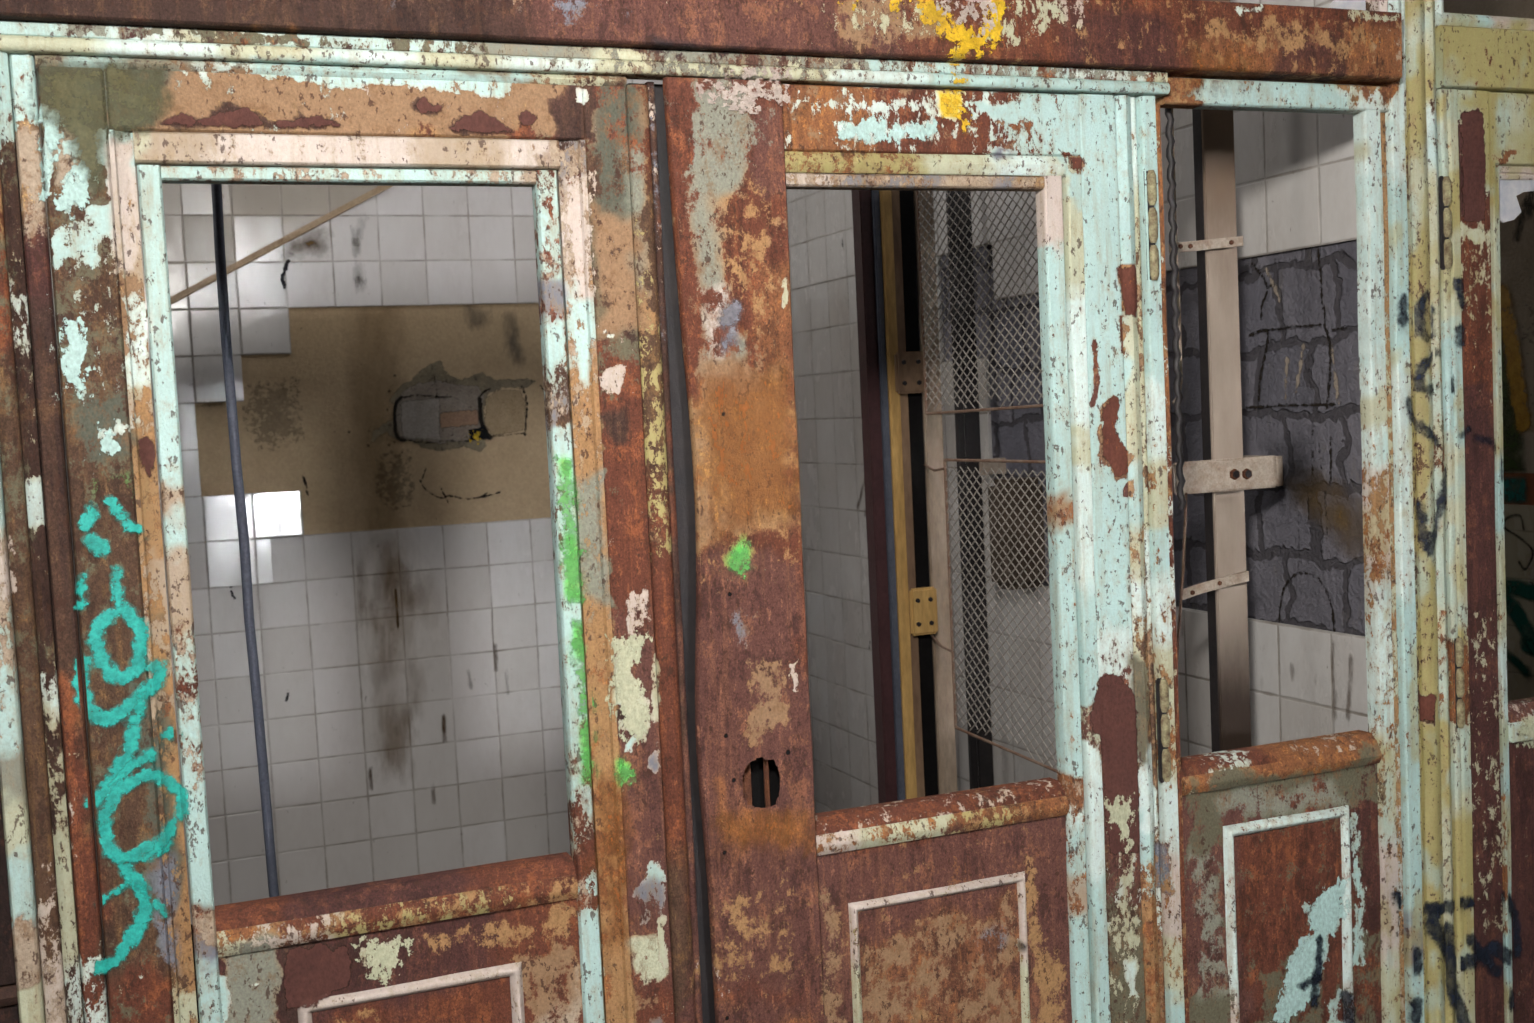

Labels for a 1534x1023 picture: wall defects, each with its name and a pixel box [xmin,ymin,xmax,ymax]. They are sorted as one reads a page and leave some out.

peeling [33,111,99,227]
corrosion [161,107,341,129]
corrosion [1459,109,1486,222]
peeling [59,312,96,399]
peeling [97,418,121,456]
spalling [371,361,536,452]
corrosion [703,369,799,533]
corrosion [1090,674,1140,855]
peeling [1273,876,1351,1023]